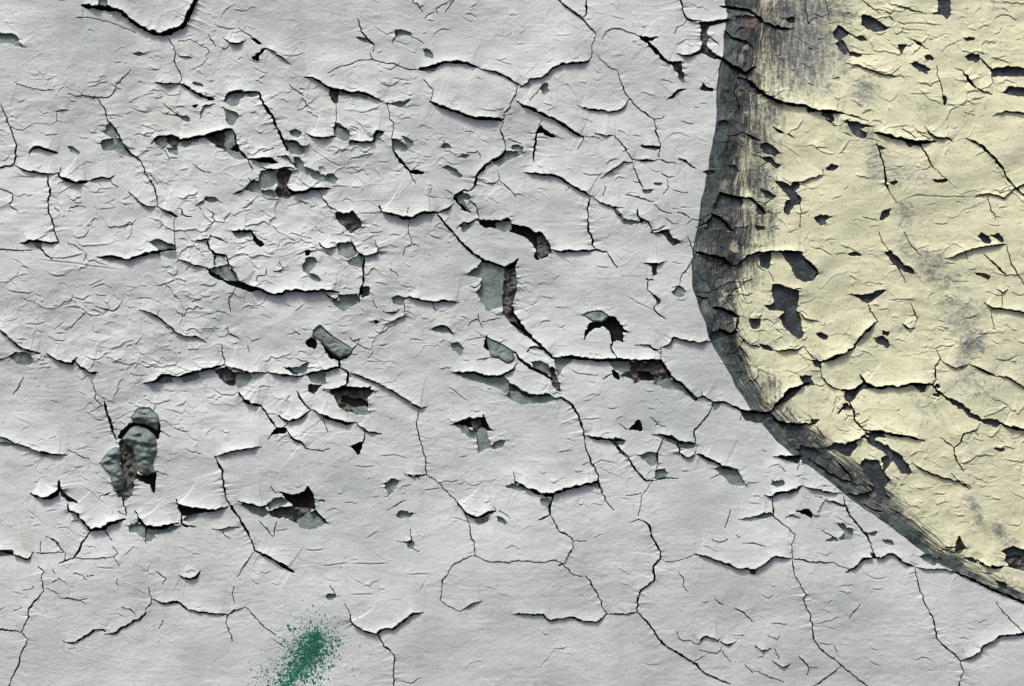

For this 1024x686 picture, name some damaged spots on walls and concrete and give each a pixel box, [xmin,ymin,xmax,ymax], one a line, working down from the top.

crack [0,71,178,246]
crack [76,0,316,119]
crack [235,91,288,170]
peeling [233,76,458,326]
crack [328,0,1024,268]
crack [0,391,382,686]
spalling [128,486,327,543]
peeling [143,325,374,415]
spalling [455,259,697,405]
crack [345,295,1024,686]
peeling [749,251,828,340]
peeling [796,383,971,493]